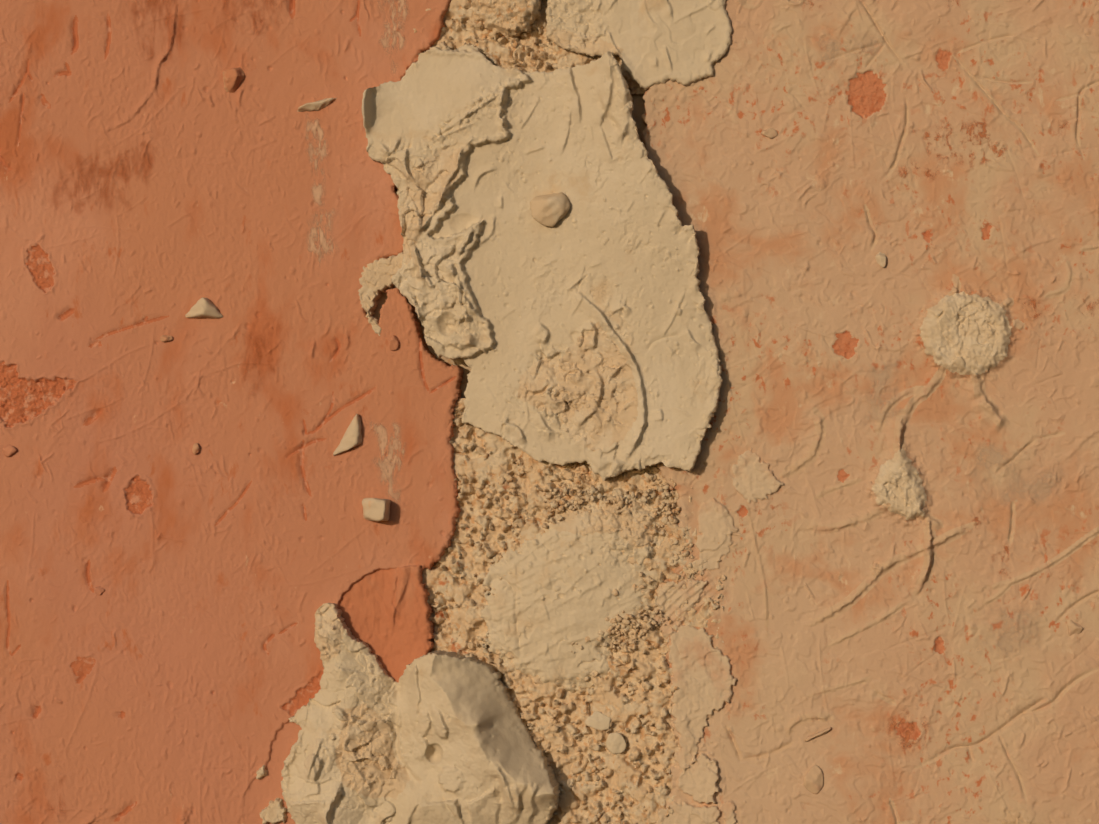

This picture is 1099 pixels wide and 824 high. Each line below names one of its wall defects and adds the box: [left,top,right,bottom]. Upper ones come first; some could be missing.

flaking render [222,67,245,93]
flaking render [297,98,337,112]
spalling [846,71,886,118]
spalling [25,244,55,293]
spalling [0,361,77,428]
flaking render [333,414,362,456]
flaking render [338,0,784,824]
spalling [125,476,153,514]
peeling [240,672,323,824]